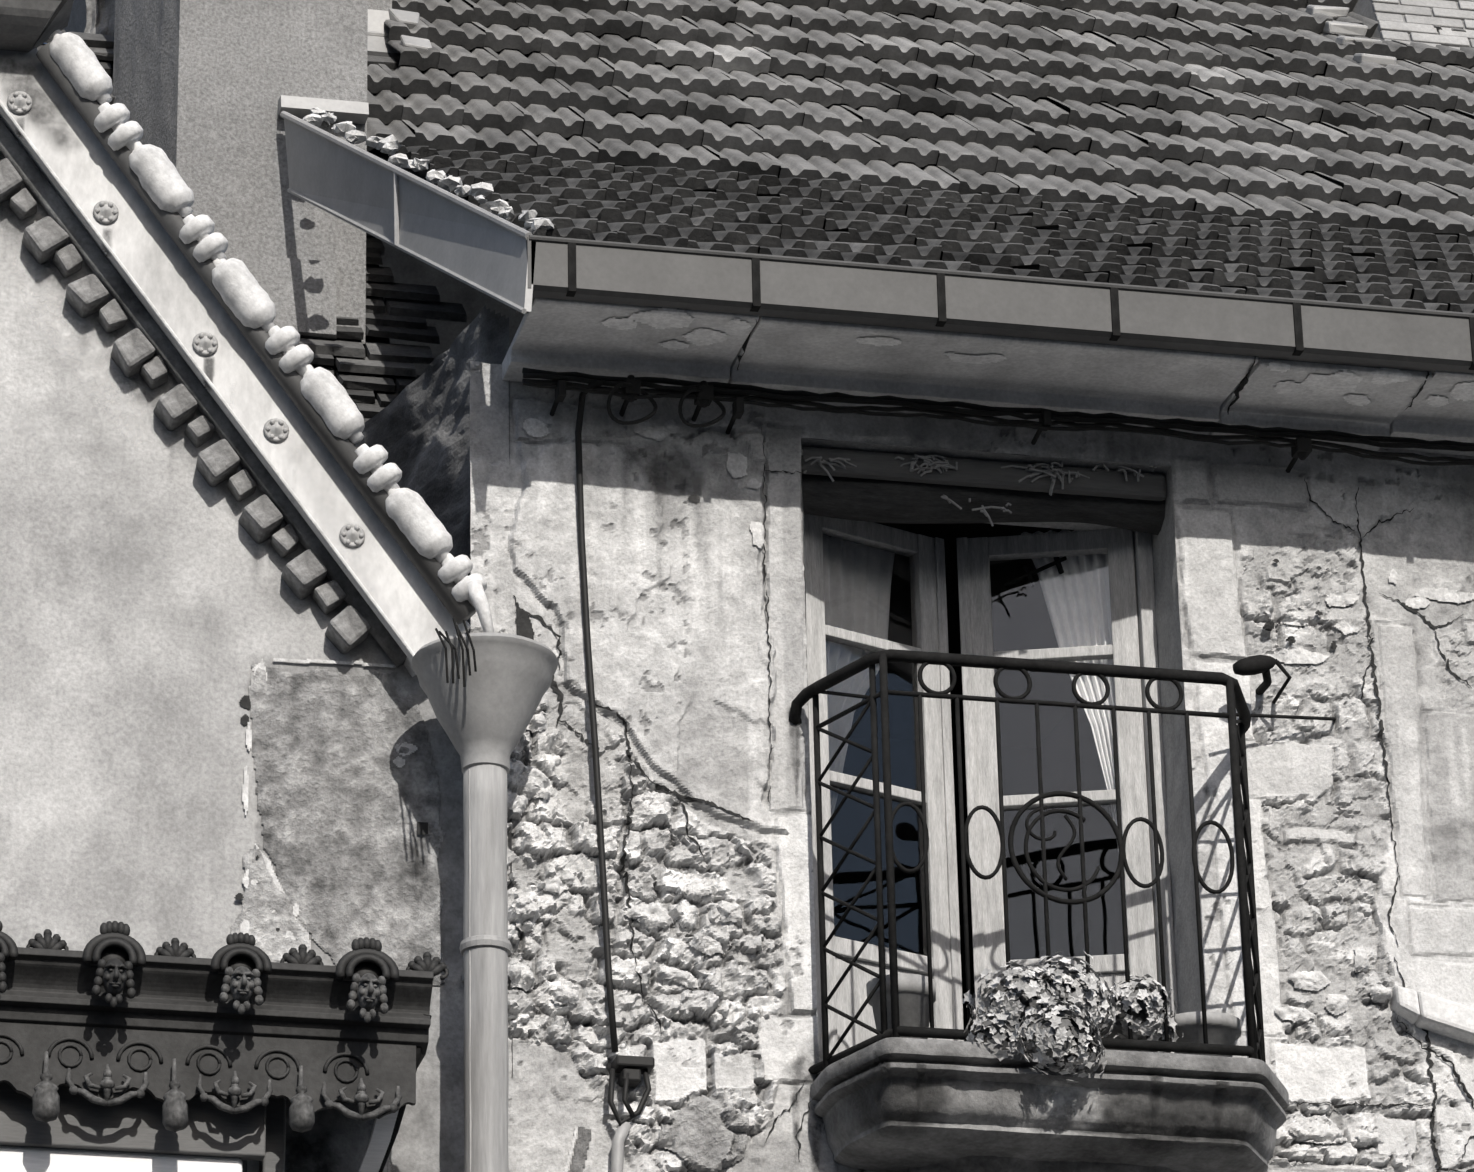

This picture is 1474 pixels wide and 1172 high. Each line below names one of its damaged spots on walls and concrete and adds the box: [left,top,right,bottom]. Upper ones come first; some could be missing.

crack [1227,356,1256,414]
crack [1405,371,1429,410]
flaking render [1405,587,1474,609]
spalling [1263,591,1361,664]
crack [513,429,801,1036]
spalling [507,714,555,815]
flaking render [231,658,445,986]
crack [1290,479,1474,1172]
spalling [623,884,714,929]
spalling [656,967,704,988]
spalling [1275,970,1350,1023]
spalling [563,1126,591,1172]